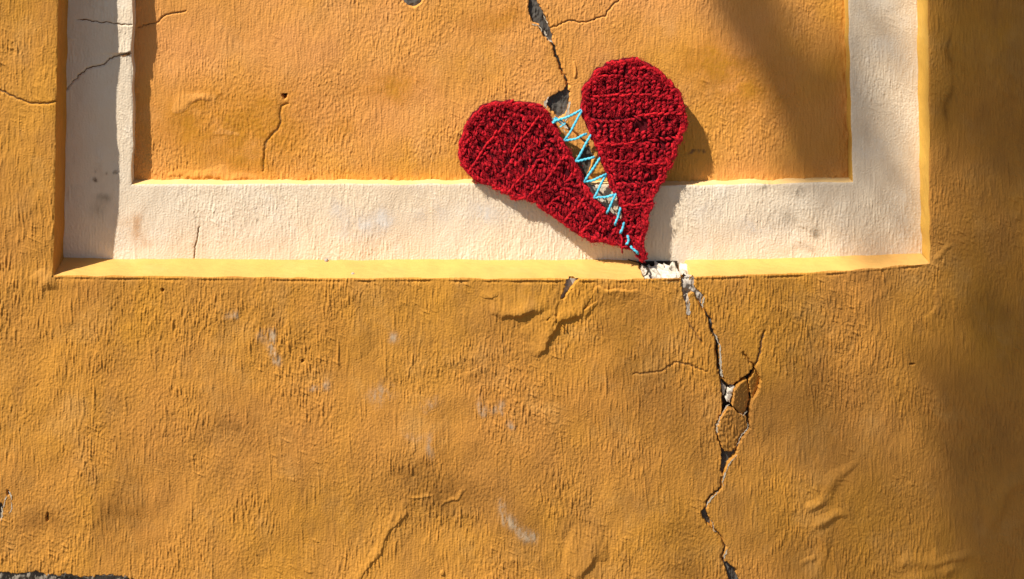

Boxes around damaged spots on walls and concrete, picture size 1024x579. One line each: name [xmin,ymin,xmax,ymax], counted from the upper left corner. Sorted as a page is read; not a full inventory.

crack [79,11,185,25]
crack [0,53,131,104]
crack [263,103,288,170]
crack [528,0,619,216]
peeling [638,261,678,269]
crack [638,273,764,579]